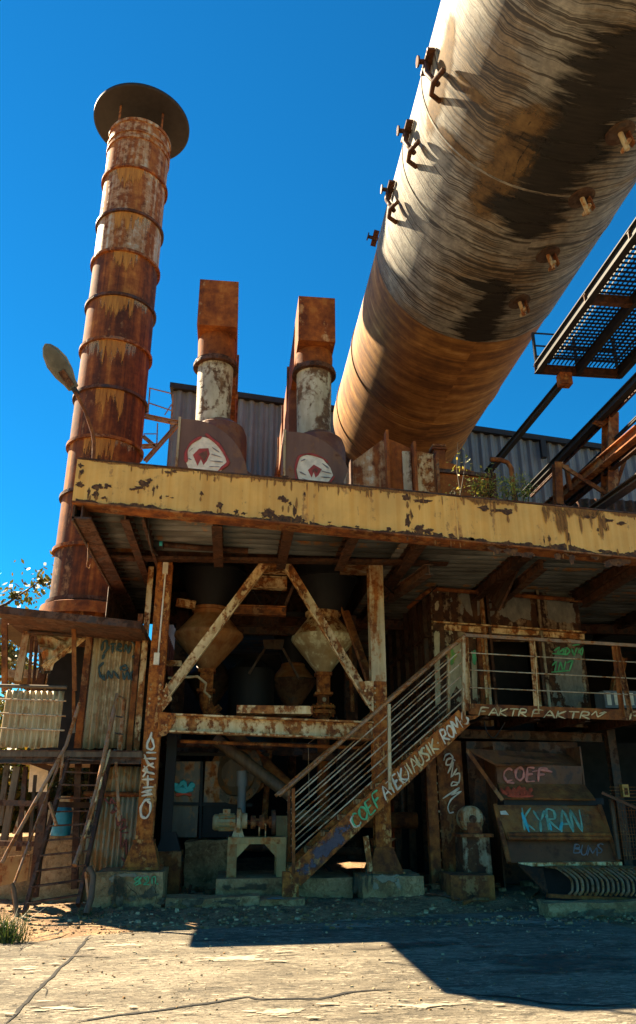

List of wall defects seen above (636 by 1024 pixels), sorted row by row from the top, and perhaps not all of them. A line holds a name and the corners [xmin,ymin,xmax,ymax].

rust [333,249,543,463]
crack [4,929,91,1024]
crack [65,988,413,1024]